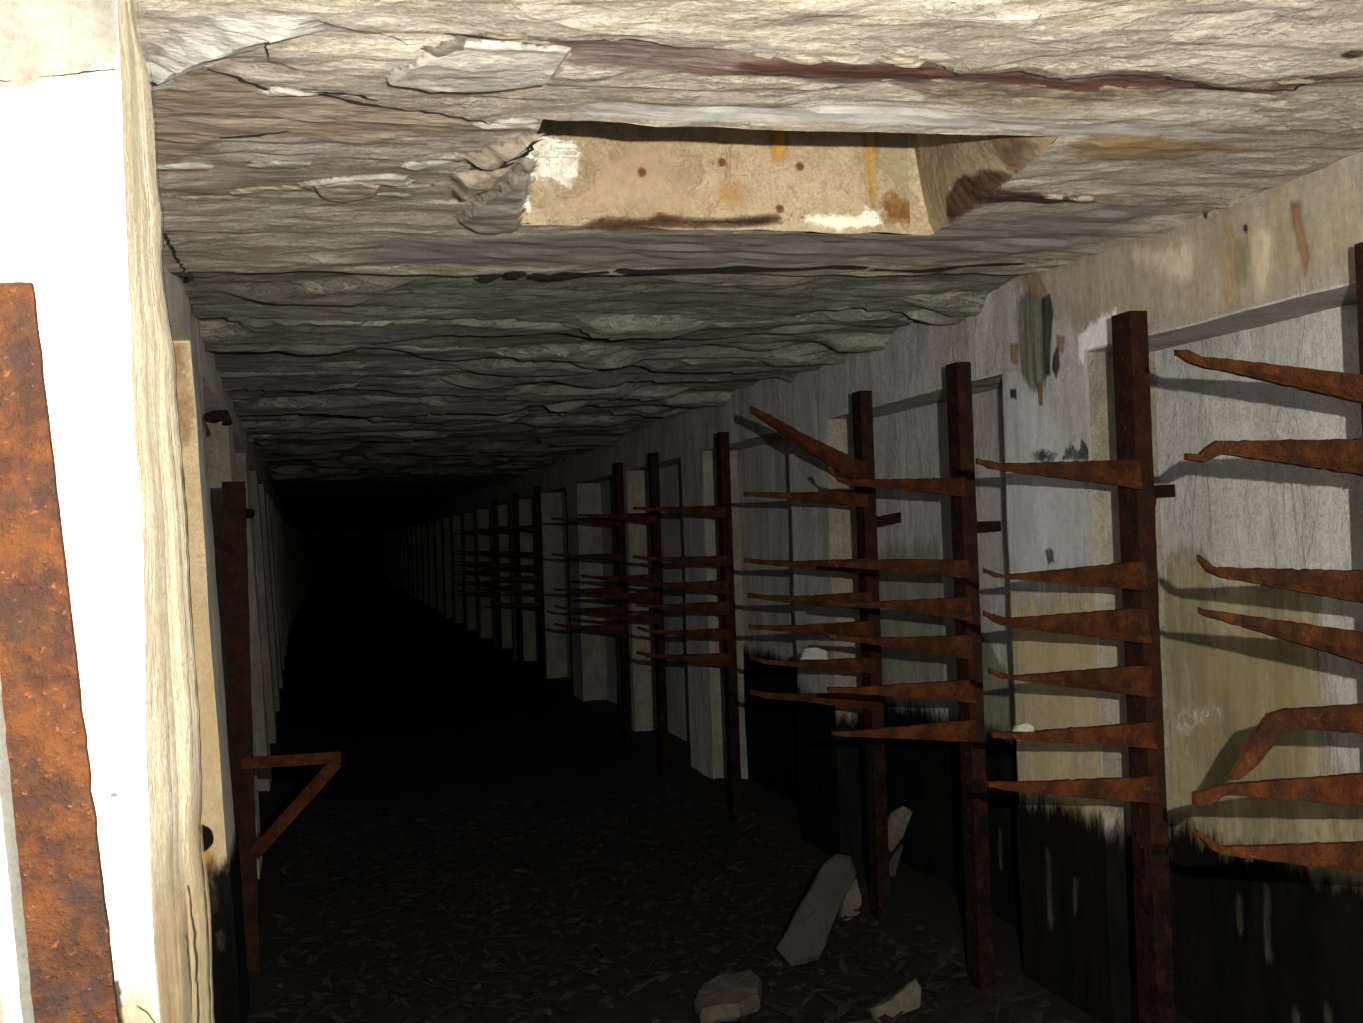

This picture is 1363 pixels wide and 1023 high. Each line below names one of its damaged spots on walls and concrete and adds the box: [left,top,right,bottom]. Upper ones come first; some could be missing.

peeling [151,68,583,234]
rust [587,213,780,229]
water stain [359,162,1363,405]
spalling [382,32,1363,110]
spalling [947,135,1096,221]
crack [0,5,213,1023]
water stain [1164,547,1363,1023]
water stain [118,829,250,1023]